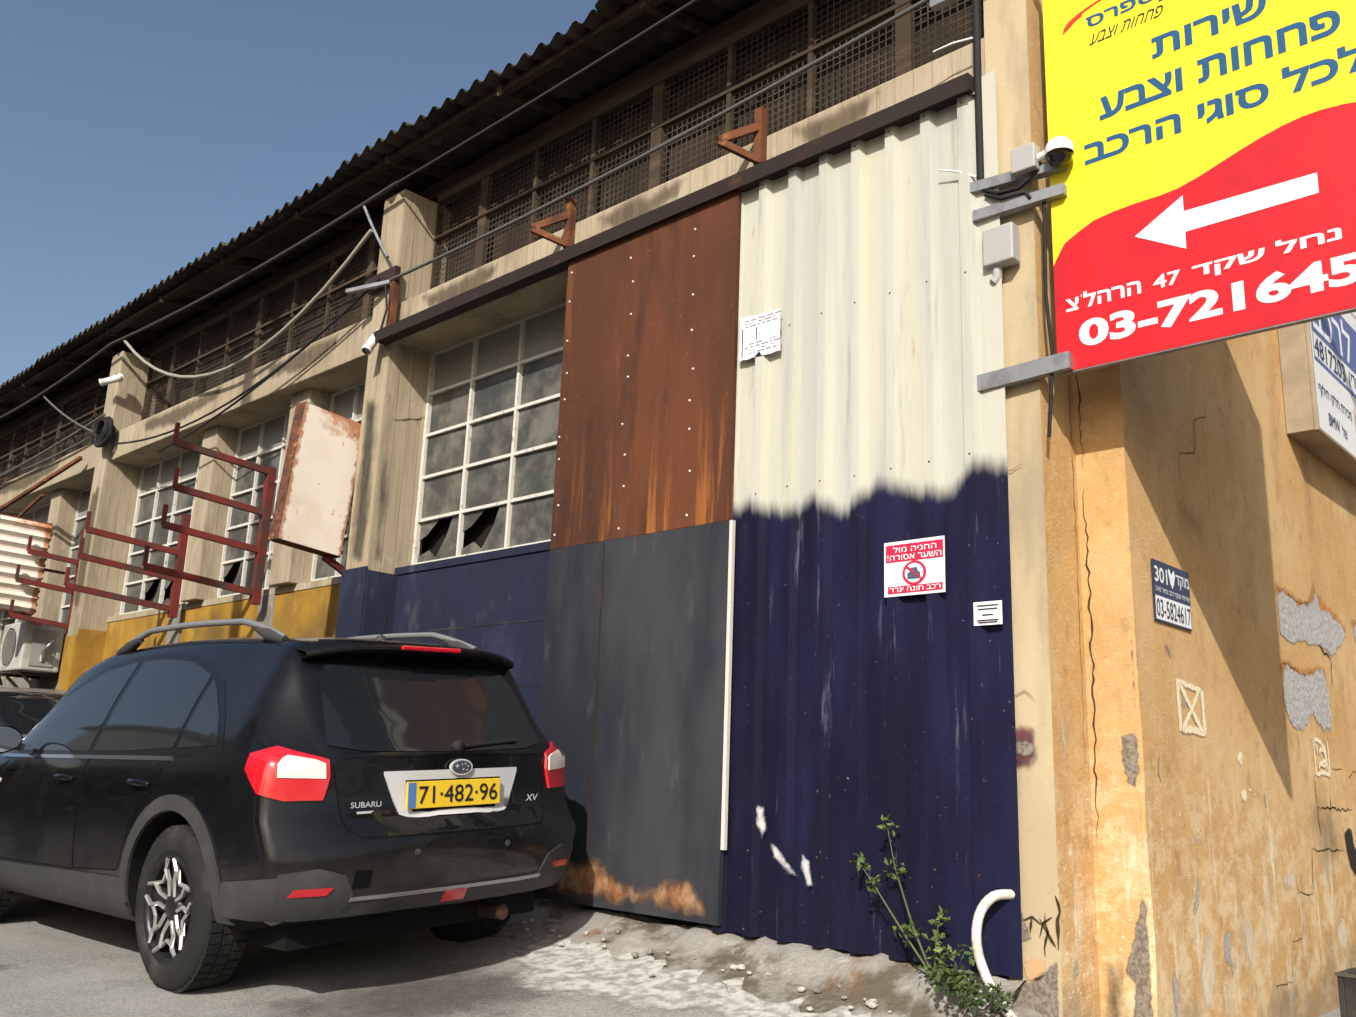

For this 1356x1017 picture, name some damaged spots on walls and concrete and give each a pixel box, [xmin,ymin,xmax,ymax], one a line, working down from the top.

rust [550,189,742,550]
crack [1162,387,1206,534]
peeling [1275,585,1356,656]
peeling [1280,660,1332,731]
rust [548,863,702,911]